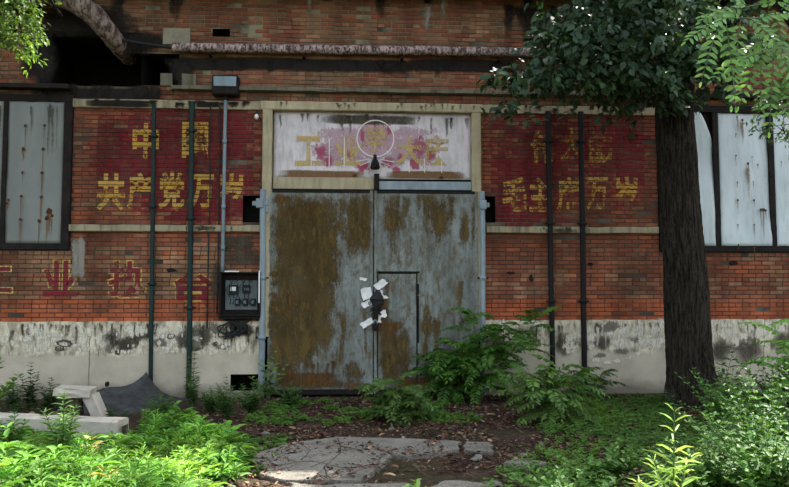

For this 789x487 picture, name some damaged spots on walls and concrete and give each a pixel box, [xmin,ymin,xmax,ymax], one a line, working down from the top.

corrosion [37,147,54,243]
corrosion [384,194,475,254]
corrosion [268,194,372,389]
water stain [9,324,78,344]
peeling [0,321,232,358]
water stain [94,323,158,351]
water stain [177,325,187,347]
water stain [199,325,259,346]
corrosion [378,283,466,388]
water stain [548,325,577,354]
water stain [594,323,610,350]
water stain [713,324,762,362]